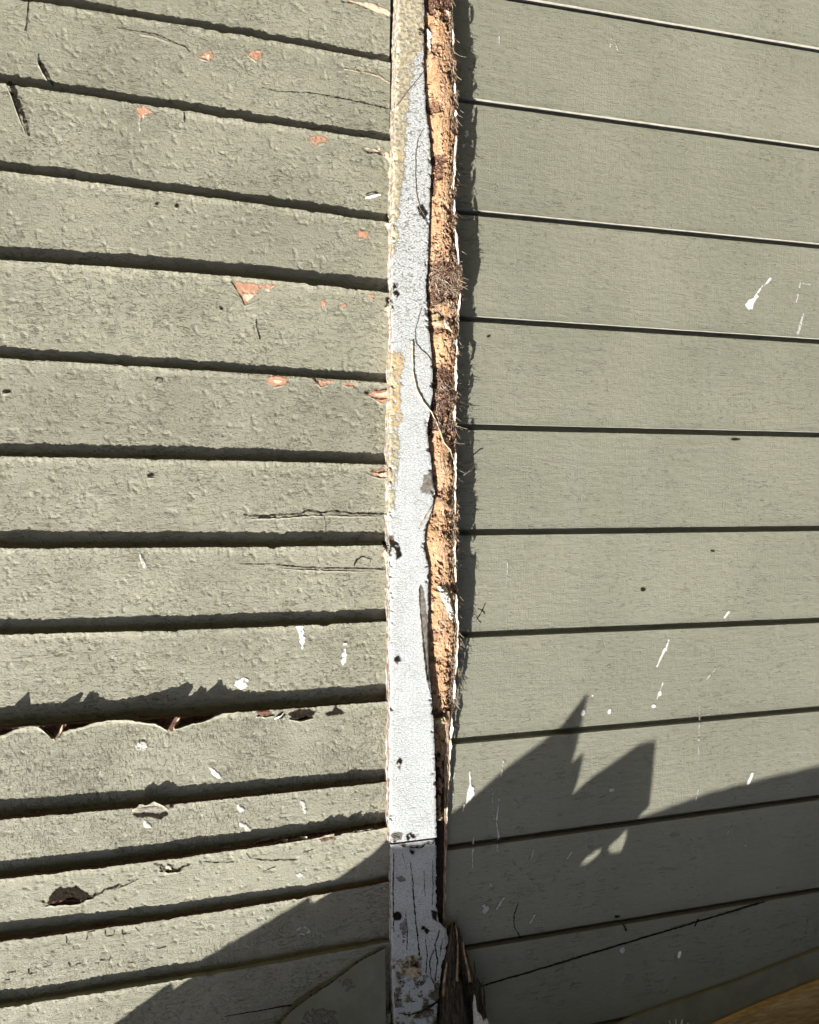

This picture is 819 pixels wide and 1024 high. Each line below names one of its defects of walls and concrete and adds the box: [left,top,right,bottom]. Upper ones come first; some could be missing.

crack [36,54,54,87]
crack [6,81,30,136]
peeling [265,376,288,389]
peeling [312,351,405,513]
crack [243,510,387,532]
crack [243,556,385,573]
peeling [0,712,239,741]
hole [256,706,344,723]
peeling [132,802,173,820]
peeling [34,879,139,909]
crack [225,853,442,1024]
crack [482,901,765,986]